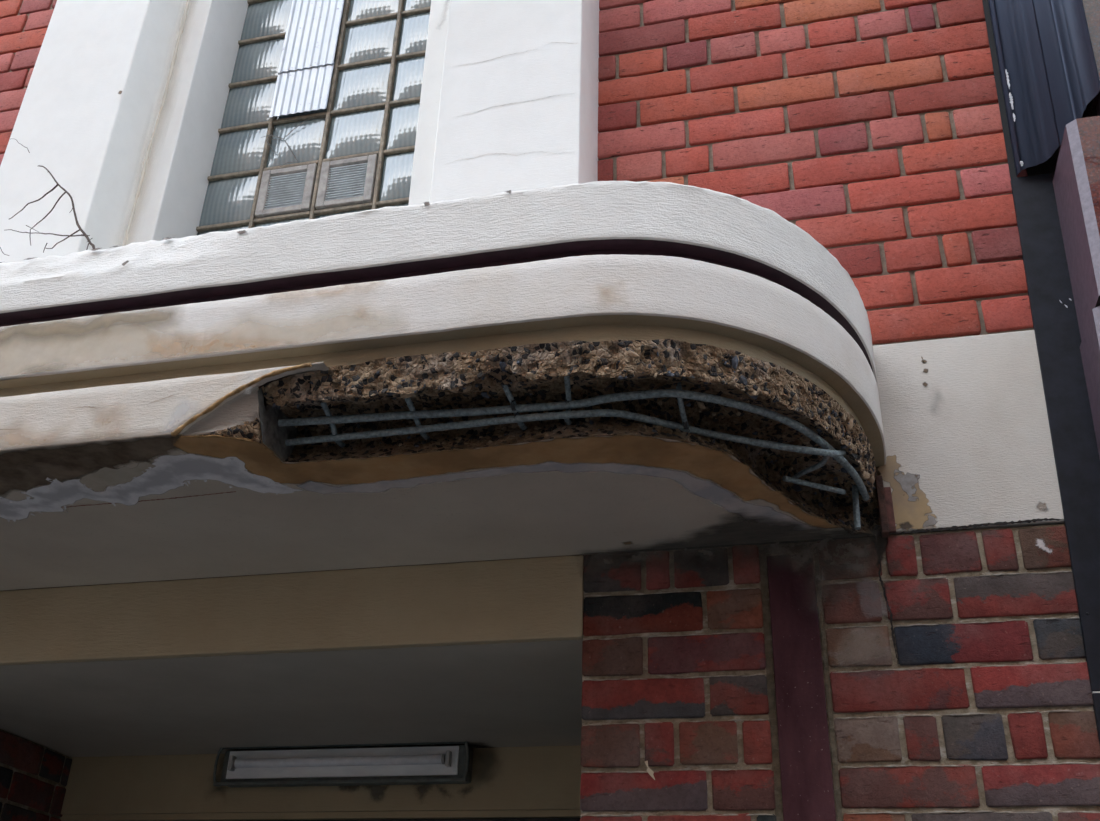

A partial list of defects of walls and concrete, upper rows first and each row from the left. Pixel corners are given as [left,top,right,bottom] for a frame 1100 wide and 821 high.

crack [458,93,573,117]
spalling [0,339,936,535]